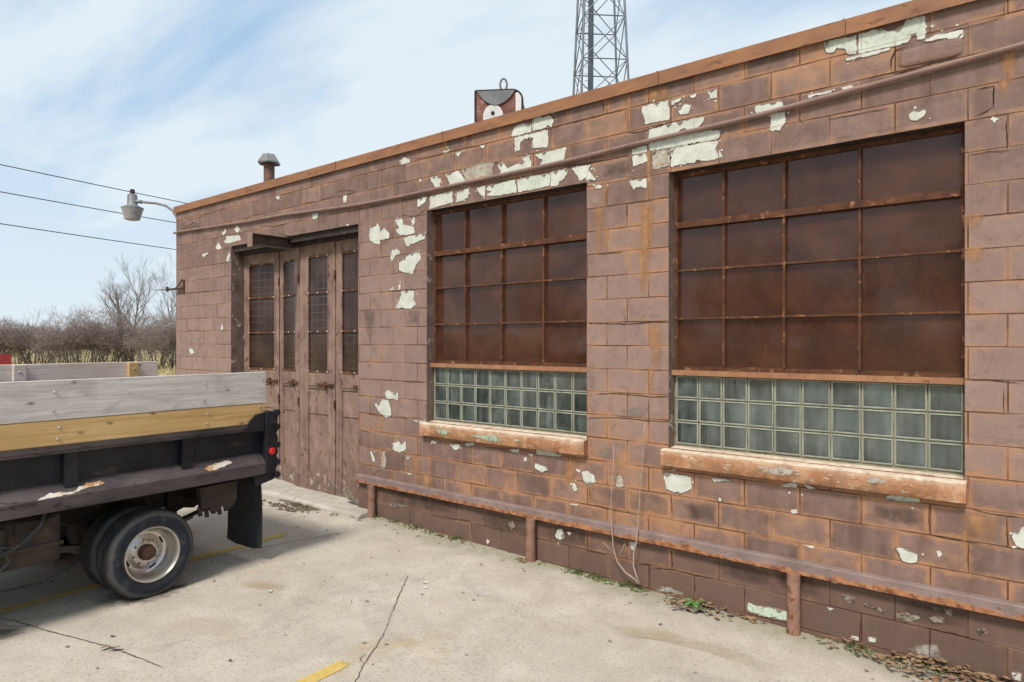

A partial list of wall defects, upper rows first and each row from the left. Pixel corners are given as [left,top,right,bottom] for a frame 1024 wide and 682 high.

peeling [823,15,965,65]
peeling [629,89,726,190]
peeling [369,113,608,310]
peeling [374,389,399,418]
peeling [663,469,694,495]
peeling [895,546,924,564]
peeling [747,602,787,621]